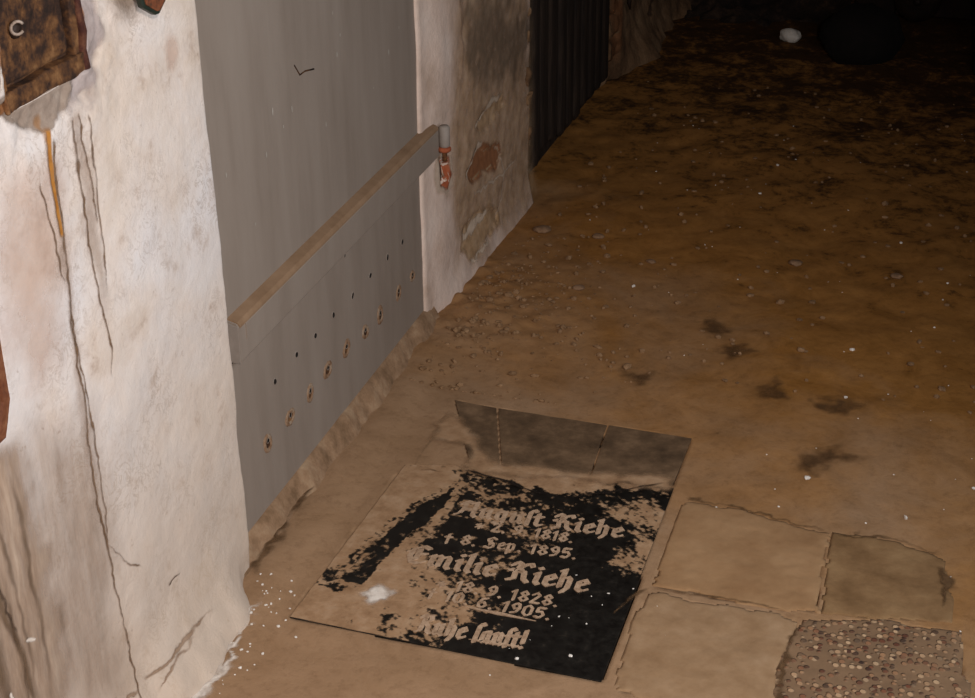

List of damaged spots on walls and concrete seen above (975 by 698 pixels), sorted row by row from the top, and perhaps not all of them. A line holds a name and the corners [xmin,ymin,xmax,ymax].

spalling [0,0,104,133]
rust [46,130,63,236]
spalling [435,155,453,195]
peeling [466,142,500,183]
leakage [452,0,530,235]
crack [127,618,203,698]